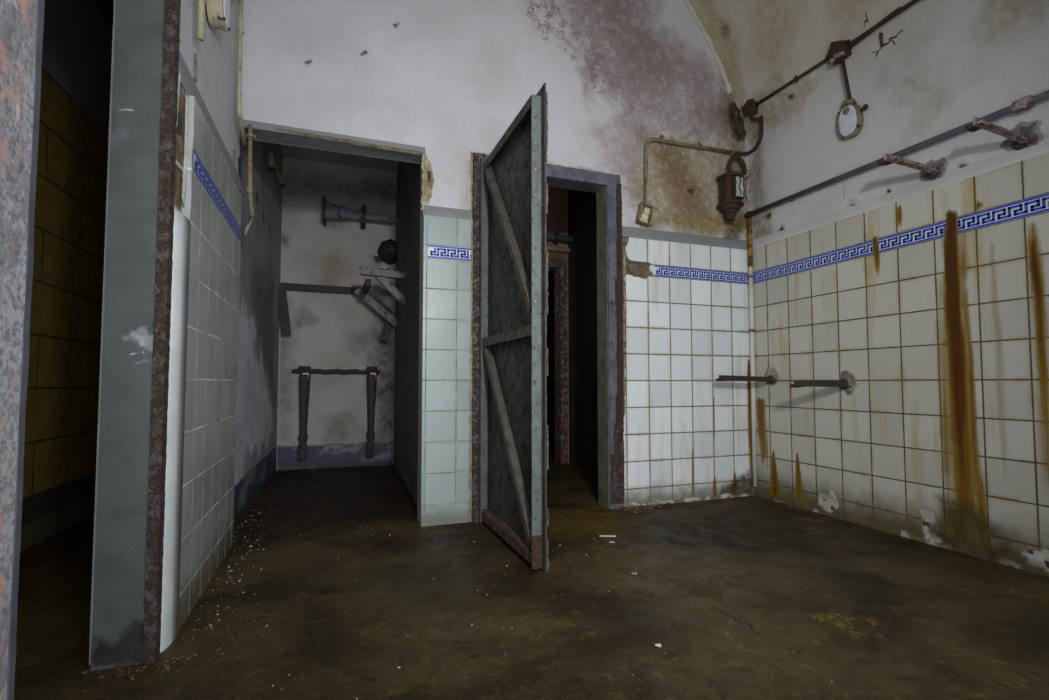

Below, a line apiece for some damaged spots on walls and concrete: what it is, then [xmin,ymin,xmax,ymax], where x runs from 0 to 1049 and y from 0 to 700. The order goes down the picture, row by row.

spalling [279,129,434,209]
damp [527,0,762,239]
crack [863,12,904,58]
spalling [622,237,653,412]
rust [747,360,781,497]
rust [794,453,804,501]
rust [943,210,986,545]
rust [1027,224,1049,474]